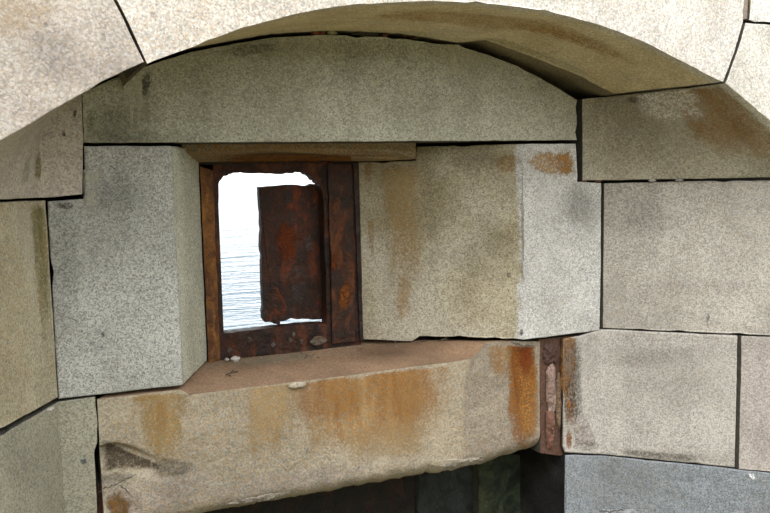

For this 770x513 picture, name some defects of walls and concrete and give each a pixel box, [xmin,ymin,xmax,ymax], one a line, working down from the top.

rust [530,152,573,173]
rust [490,346,538,441]
rust [561,337,577,448]
rust [107,494,130,513]